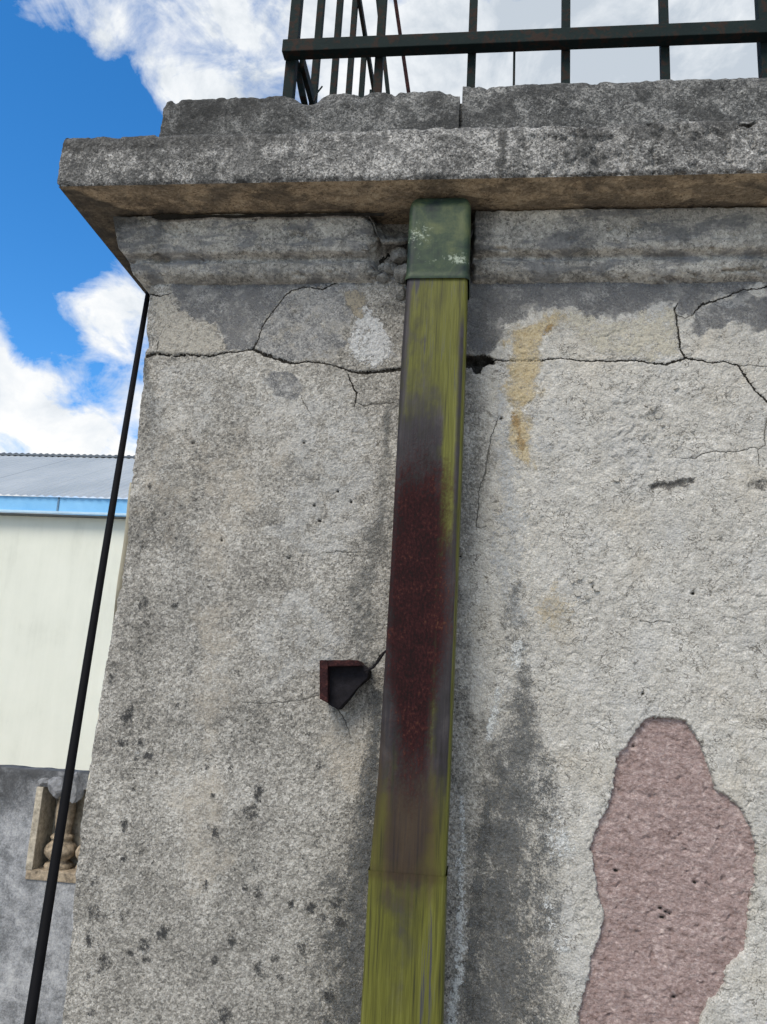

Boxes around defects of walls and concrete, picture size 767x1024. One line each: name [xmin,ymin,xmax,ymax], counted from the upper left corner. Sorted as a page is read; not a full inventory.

crack [146,283,401,407]
crack [476,416,499,528]
corrosion [500,312,566,469]
crack [466,286,767,464]
leakage [446,385,575,1024]
flaking render [577,716,756,1024]